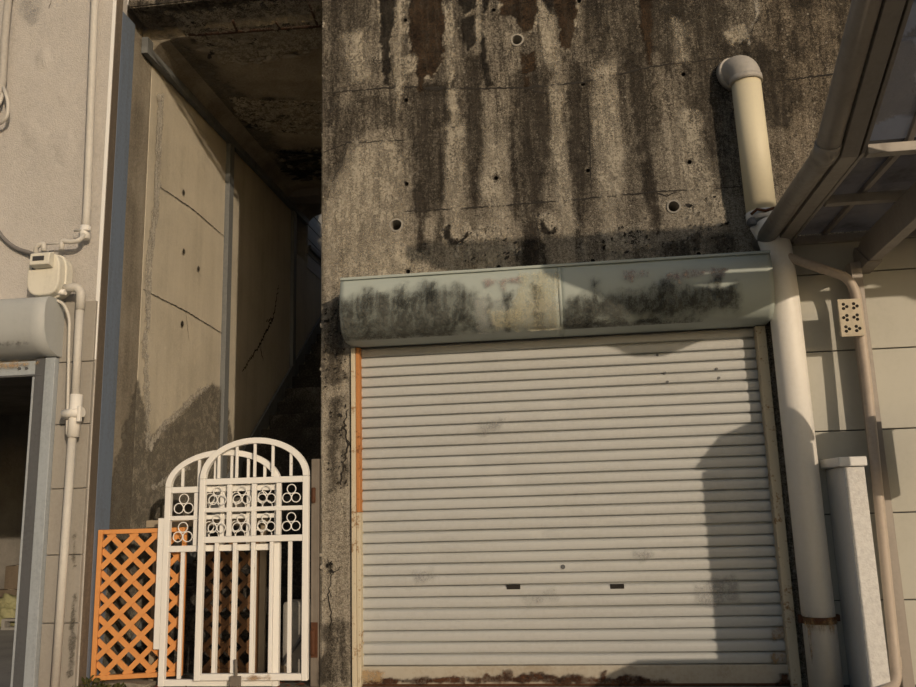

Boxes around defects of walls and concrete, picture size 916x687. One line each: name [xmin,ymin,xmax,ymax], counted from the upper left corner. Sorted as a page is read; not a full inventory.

corrosion [377,0,446,92]
corrosion [458,0,579,87]
corrosion [639,0,653,65]
damp [324,0,799,284]
crack [243,286,279,371]
crack [337,410,351,485]